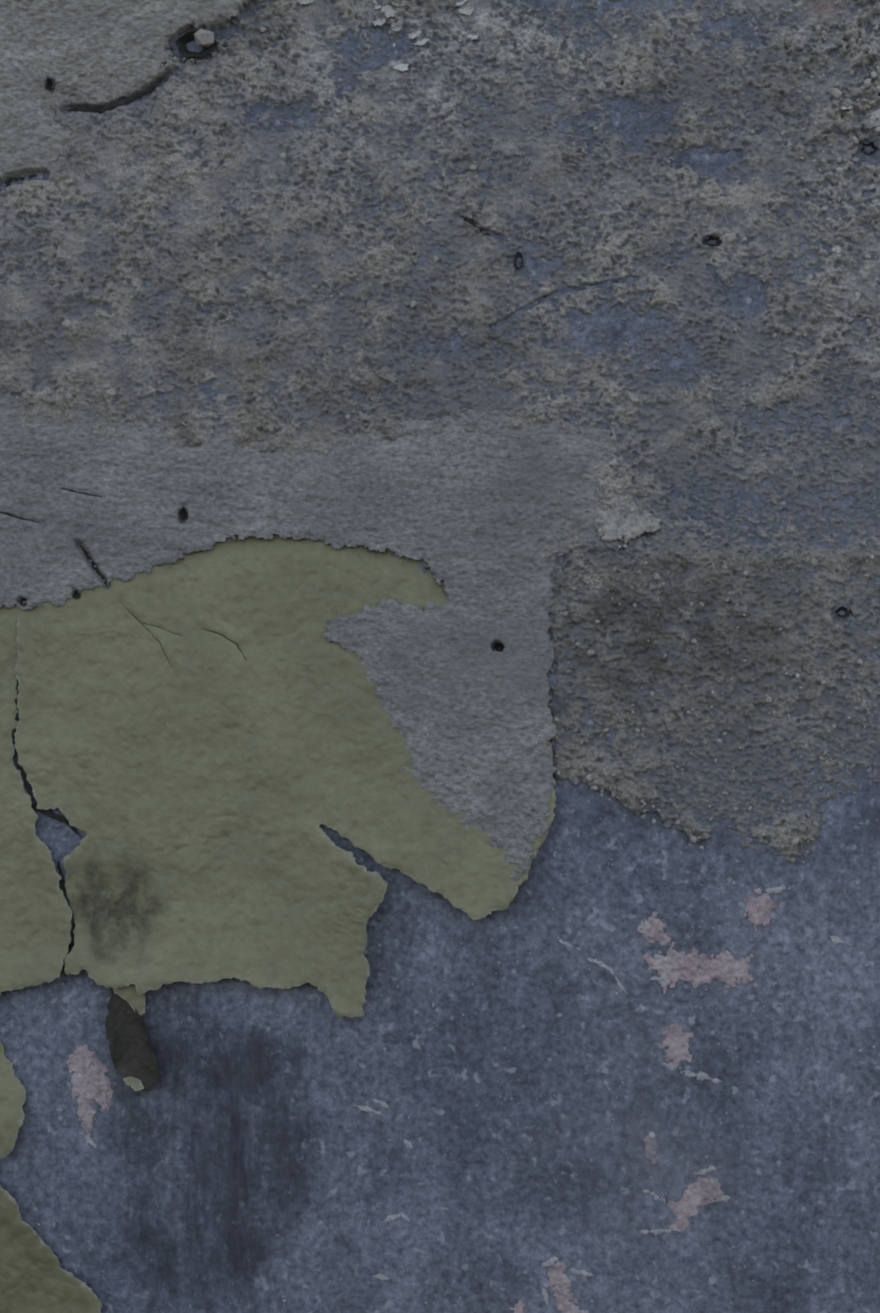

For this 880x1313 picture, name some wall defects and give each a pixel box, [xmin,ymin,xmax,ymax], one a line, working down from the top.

crack [65,69,173,112]
crack [0,174,37,191]
spalling [0,0,880,995]
crack [11,679,81,837]
peeling [14,534,531,1092]
crack [58,860,75,976]
peeling [0,1040,26,1159]
peeling [66,1045,116,1148]
peeling [658,1024,722,1083]
peeling [0,1185,102,1313]
peeling [542,1257,594,1313]
peeling [640,1165,730,1235]